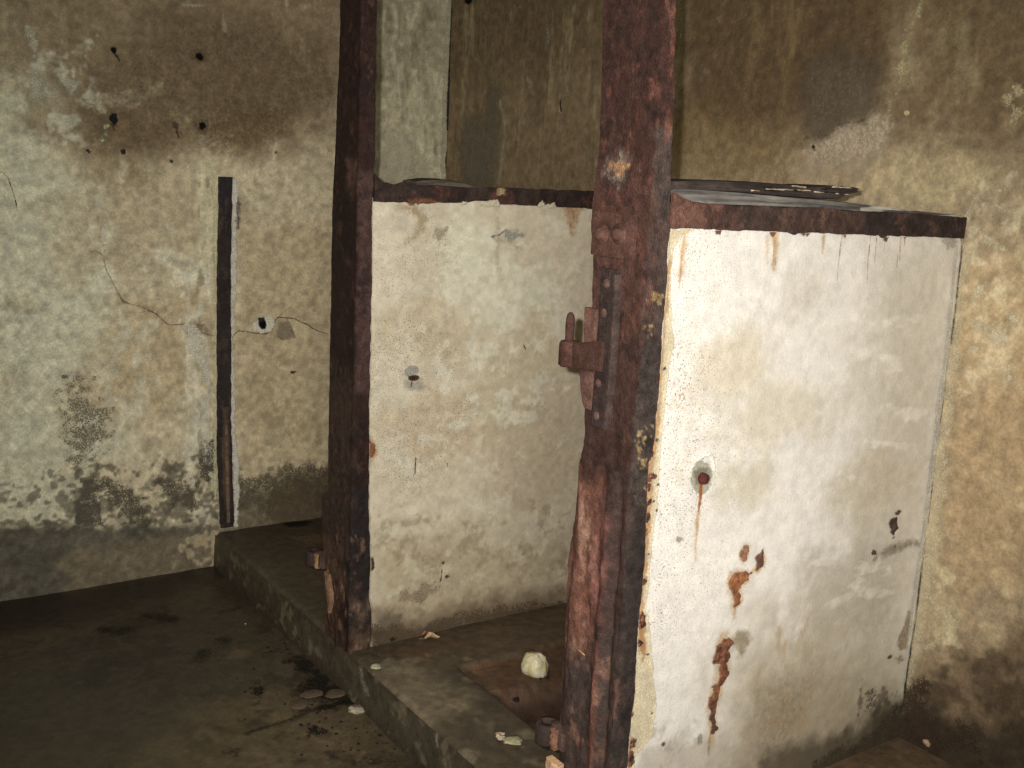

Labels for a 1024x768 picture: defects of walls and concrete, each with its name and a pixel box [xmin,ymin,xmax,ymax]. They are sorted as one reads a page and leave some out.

spalling [252,314,294,340]
crack [232,310,327,338]
damp [56,370,115,465]
damp [75,477,152,528]
damp [156,439,217,513]
damp [233,463,328,544]
damp [812,676,983,768]